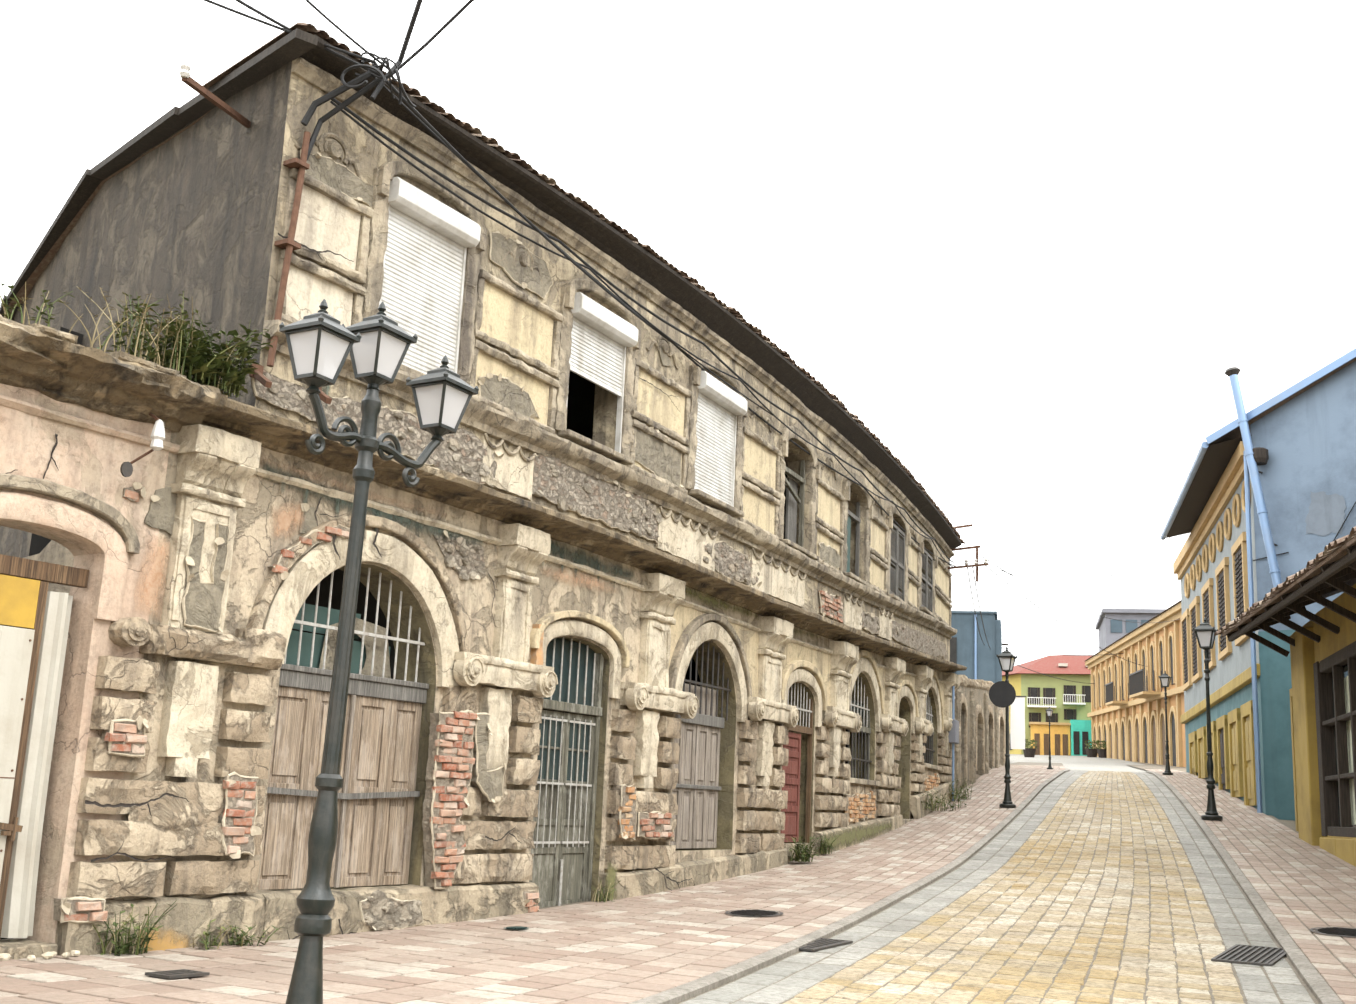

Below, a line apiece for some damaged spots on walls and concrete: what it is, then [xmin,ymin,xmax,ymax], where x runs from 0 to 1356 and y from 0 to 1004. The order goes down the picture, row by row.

crack [5,434,58,479]
spalling [267,503,367,580]
spalling [101,715,149,757]
spalling [422,710,507,889]
spalling [611,783,674,840]
spalling [842,791,876,822]
spalling [53,896,108,924]
spalling [359,890,423,931]